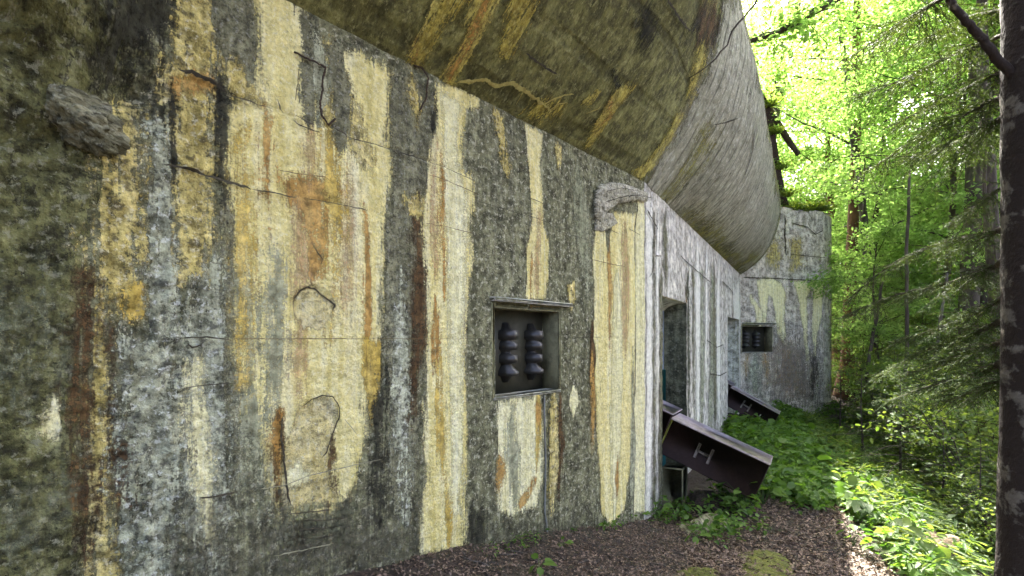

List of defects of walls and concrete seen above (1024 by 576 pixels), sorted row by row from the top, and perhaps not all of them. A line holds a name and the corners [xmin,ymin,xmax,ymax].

rust [55,265,152,567]
rust [266,407,311,520]
rust [324,432,339,515]
leakage [71,0,824,576]
crack [164,68,825,324]